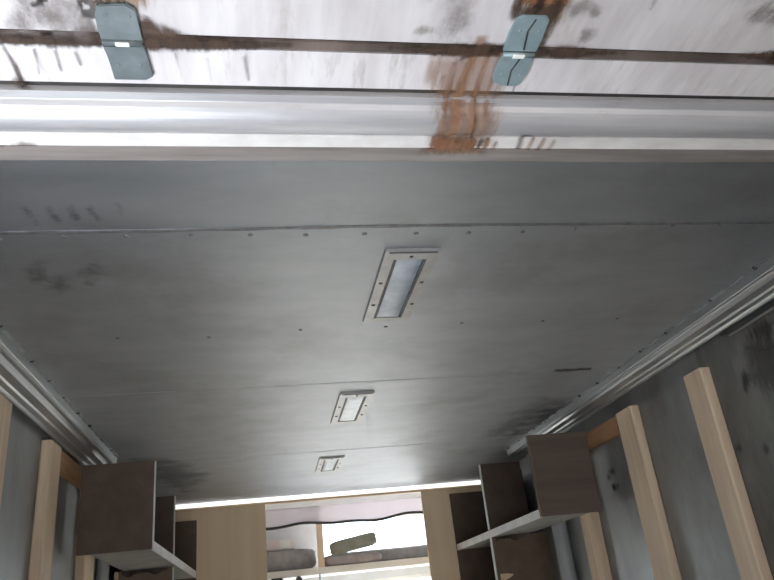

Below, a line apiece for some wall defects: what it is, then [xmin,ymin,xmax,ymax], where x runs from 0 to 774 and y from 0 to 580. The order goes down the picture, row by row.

corrosion [512,0,567,46]
corrosion [432,56,496,153]